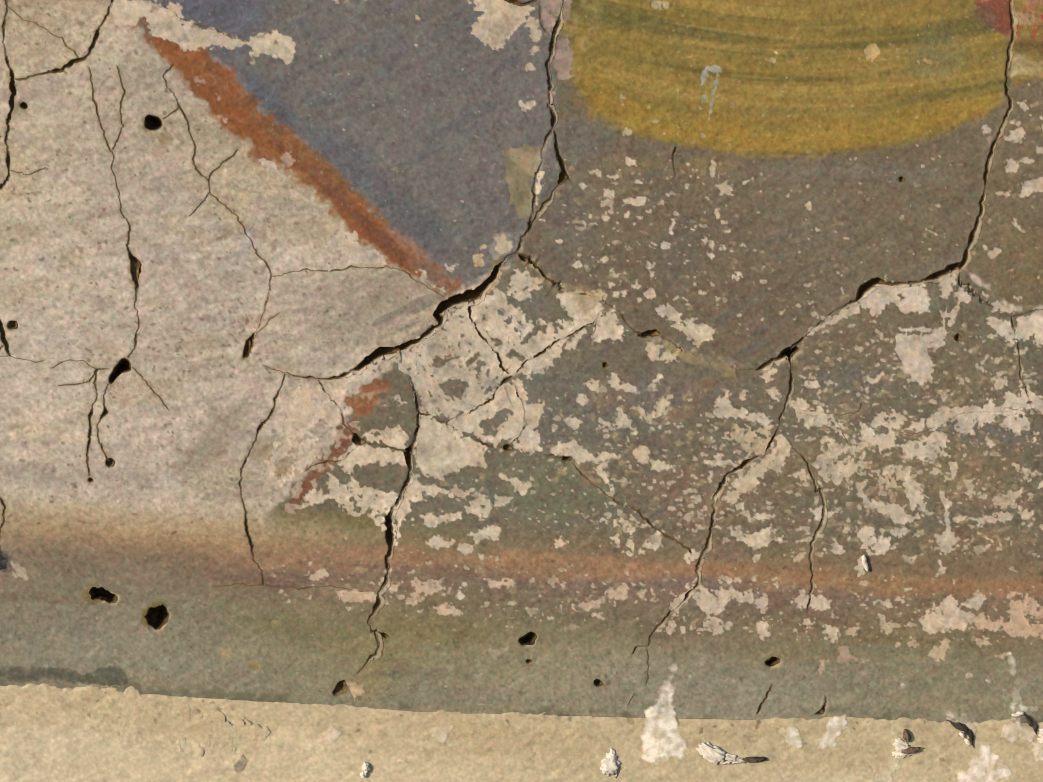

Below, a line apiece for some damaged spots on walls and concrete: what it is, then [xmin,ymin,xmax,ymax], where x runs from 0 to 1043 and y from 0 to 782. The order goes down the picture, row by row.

peeling [110,0,296,65]
peeling [467,0,574,112]
crack [0,0,168,475]
peeling [298,156,754,558]
crack [162,0,1043,705]
peeling [563,273,1043,642]
peeling [337,574,468,617]
peeling [790,589,870,675]
peeling [880,590,1043,662]
damp [639,663,692,766]
damp [778,714,849,750]
damp [946,652,1043,782]